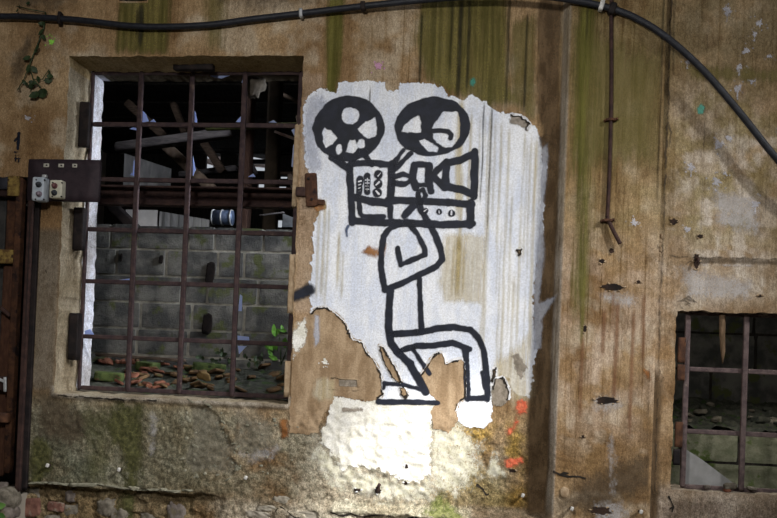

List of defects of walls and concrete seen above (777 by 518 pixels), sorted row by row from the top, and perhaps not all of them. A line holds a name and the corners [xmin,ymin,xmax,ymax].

damp [451,0,470,94]
spalling [600,282,626,292]
peeling [289,305,410,435]
peeling [420,350,467,433]
spalling [593,395,620,404]